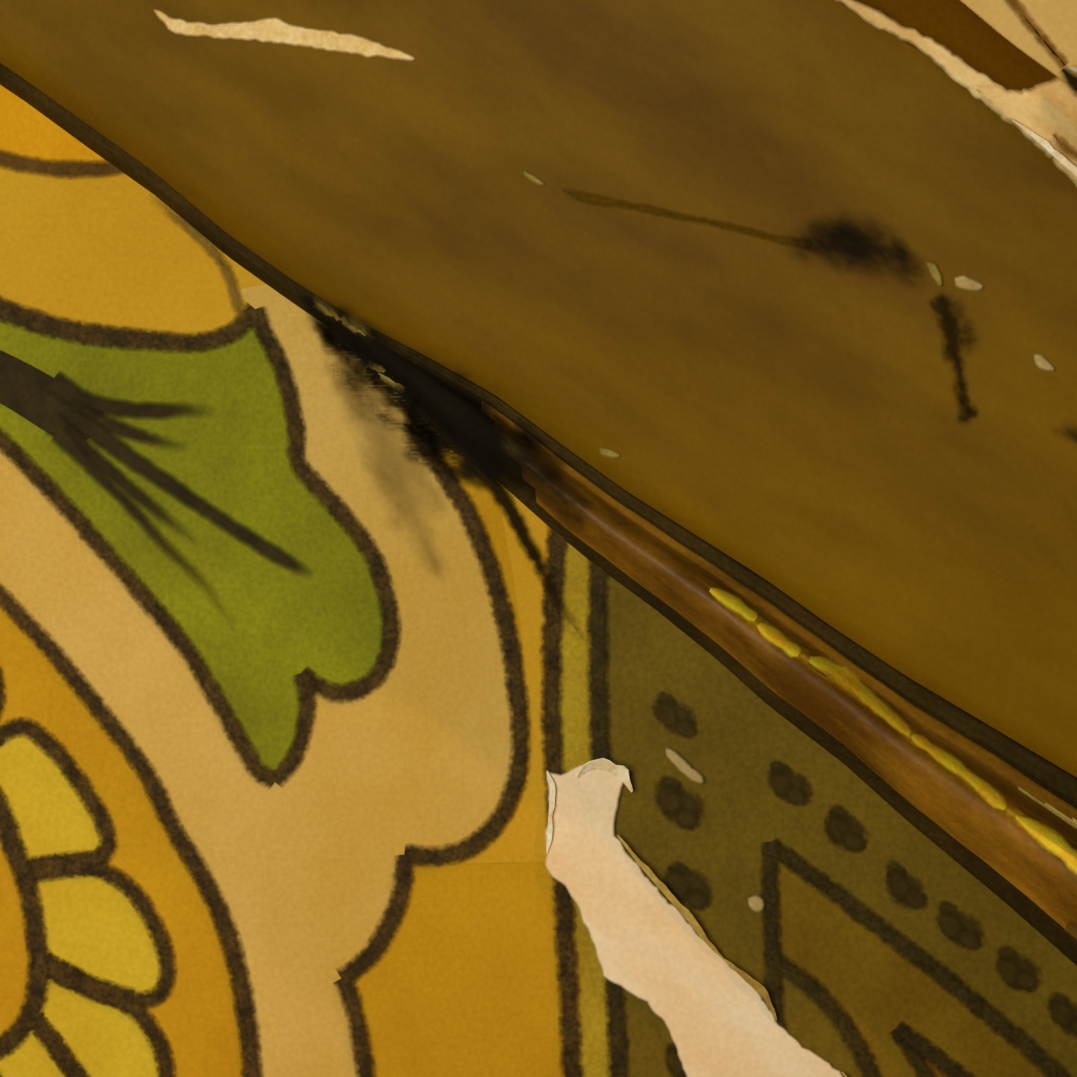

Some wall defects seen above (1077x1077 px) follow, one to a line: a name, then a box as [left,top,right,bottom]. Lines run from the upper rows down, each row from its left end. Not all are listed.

flaking render [976,79,1077,184]
crack [572,193,909,270]
peeling [666,748,703,783]
peeling [546,758,847,1077]